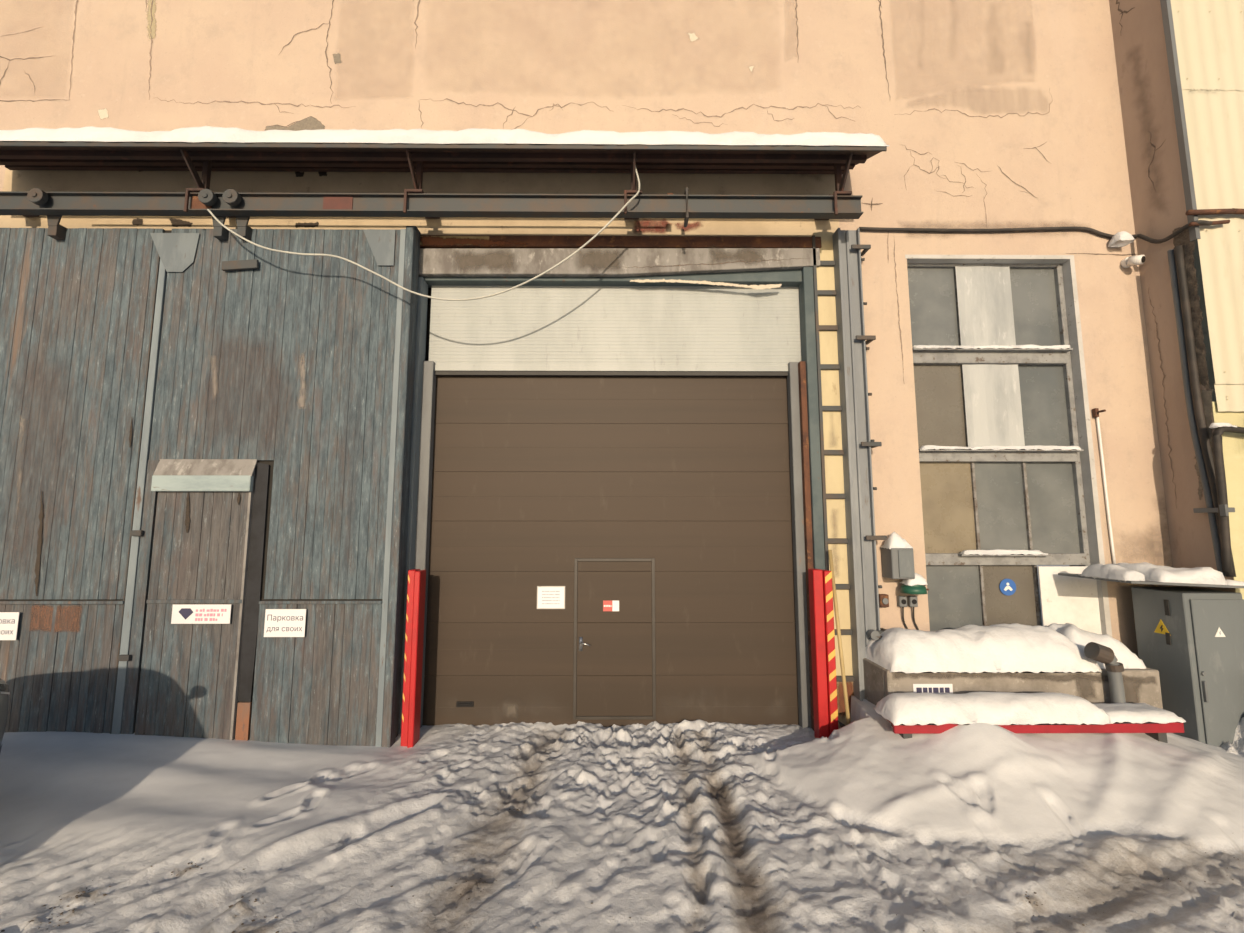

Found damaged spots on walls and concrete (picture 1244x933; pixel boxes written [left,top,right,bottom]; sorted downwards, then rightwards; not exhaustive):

crack [1116,0,1135,30]
crack [0,0,78,102]
crack [145,0,353,114]
spalling [265,116,325,131]
crack [419,98,861,130]
crack [863,0,1050,228]
corrosion [420,236,528,246]
crack [627,258,807,268]
crack [1066,250,1135,258]
crack [887,240,904,381]